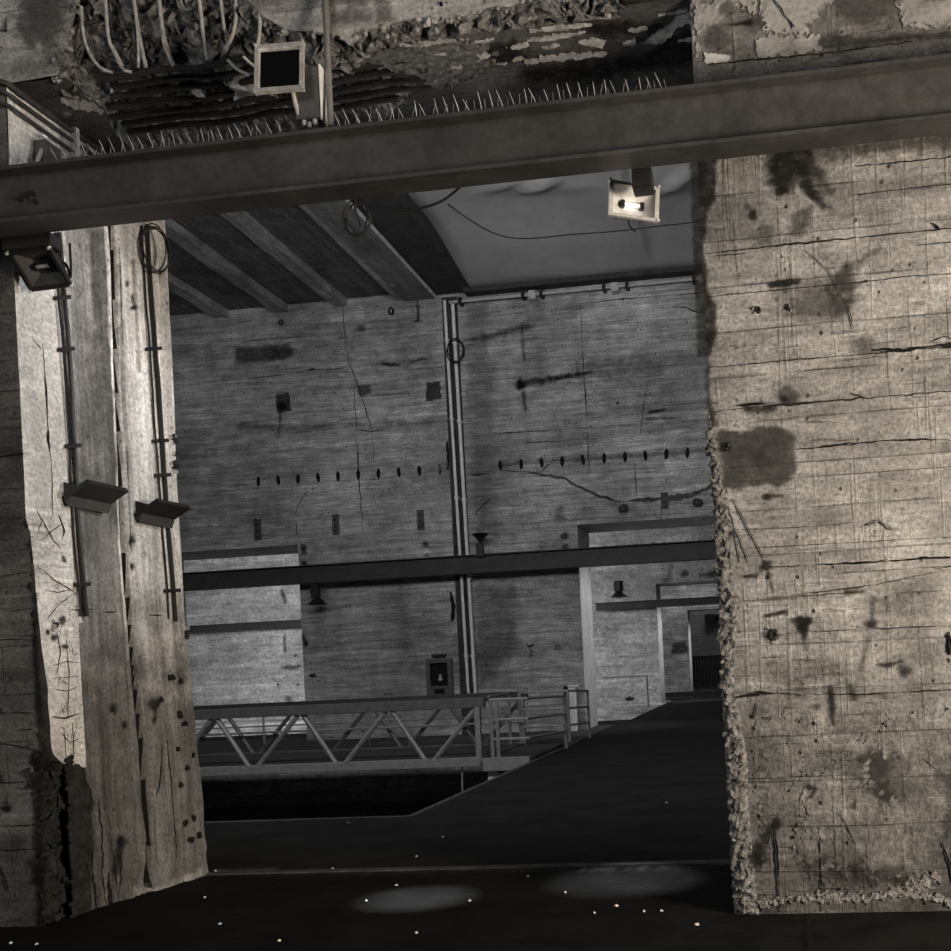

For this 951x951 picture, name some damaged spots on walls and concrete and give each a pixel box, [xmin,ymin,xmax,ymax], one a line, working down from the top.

spalling [49,0,624,150]
peeling [622,0,834,65]
peeling [894,0,951,31]
damp [767,149,831,226]
crack [471,222,951,518]
damp [689,160,801,500]
damp [826,263,855,315]
crack [734,466,951,600]
spalling [703,409,951,915]